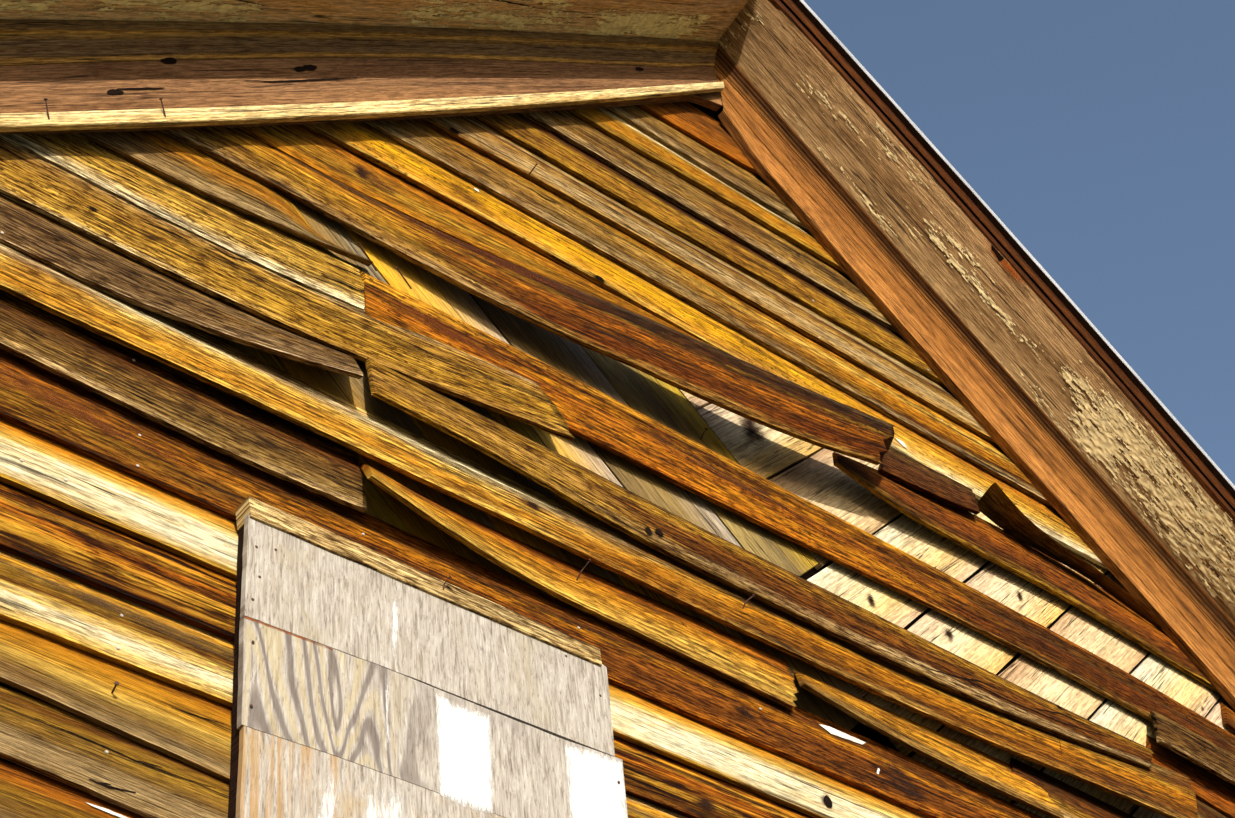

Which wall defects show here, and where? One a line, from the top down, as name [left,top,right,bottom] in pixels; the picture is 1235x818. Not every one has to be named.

peeling [796,71,1044,360]
peeling [1002,360,1235,613]